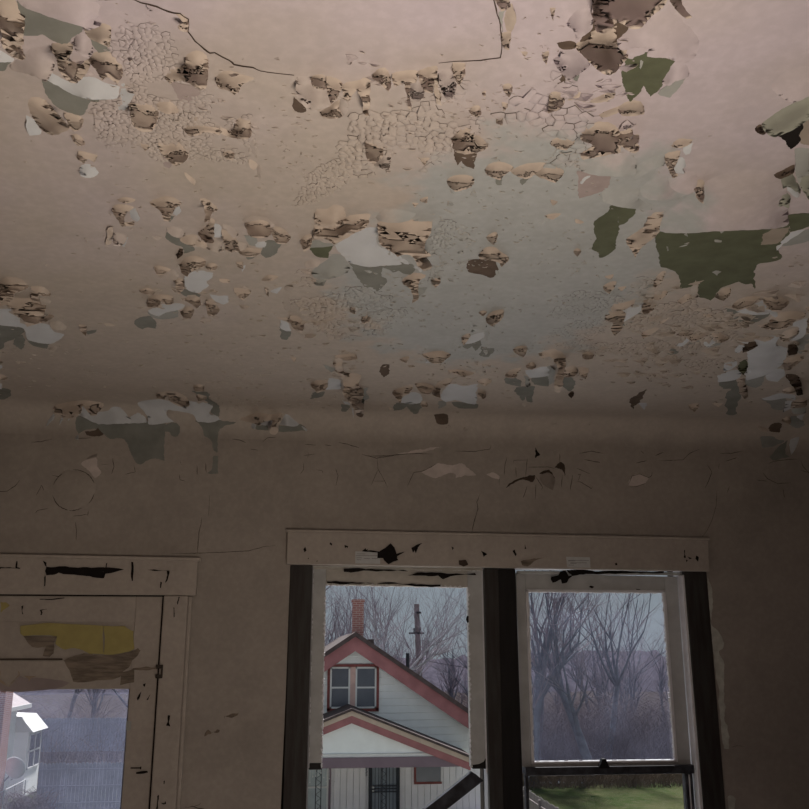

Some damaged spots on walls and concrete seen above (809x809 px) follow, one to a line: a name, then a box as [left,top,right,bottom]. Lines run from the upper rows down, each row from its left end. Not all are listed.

crack [135,0,294,76]
crack [443,0,516,63]
peeling [0,0,809,474]
flaking render [422,463,476,478]
spalling [506,462,565,497]
peeling [45,566,124,578]
spalling [327,543,476,587]
peeling [0,623,156,692]